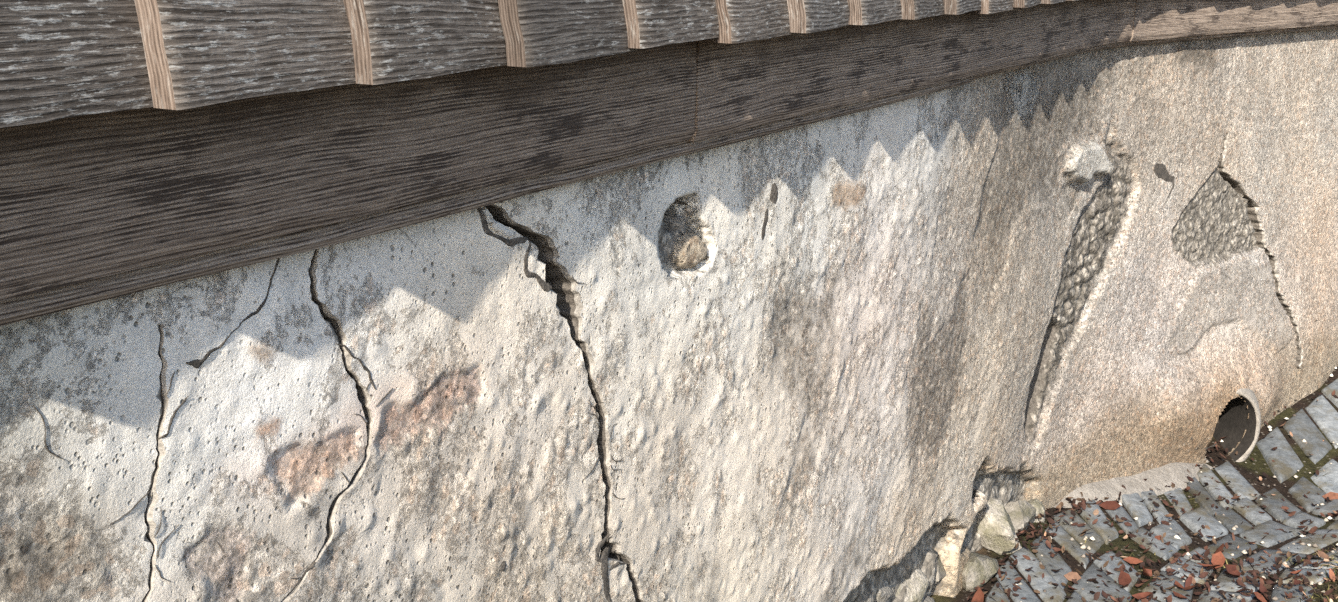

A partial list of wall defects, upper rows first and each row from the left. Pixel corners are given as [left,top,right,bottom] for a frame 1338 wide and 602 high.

spalling [658,199,712,273]
spalling [986,75,1132,441]
crack [1154,163,1175,206]
spalling [1172,168,1293,354]
crack [1217,133,1303,369]
crack [110,249,393,602]
crack [477,204,646,602]
spalling [843,462,1043,602]